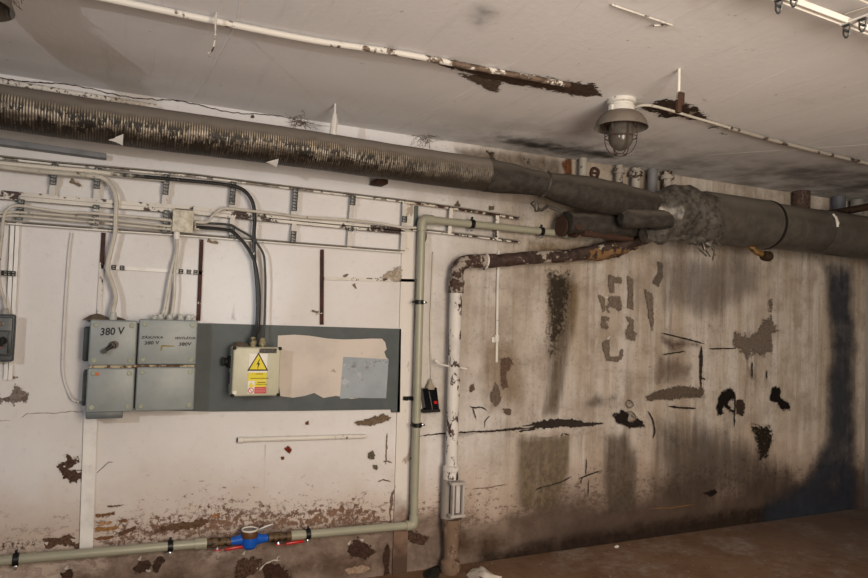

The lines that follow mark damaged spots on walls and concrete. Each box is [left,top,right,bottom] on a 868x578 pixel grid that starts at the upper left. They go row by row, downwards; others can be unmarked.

peeling [644,261,663,332]
peeling [598,274,637,362]
flaking render [0,376,29,406]
peeling [354,413,391,426]
leakage [458,268,856,562]
flaking render [56,454,82,484]
crack [354,406,603,525]
flaking render [43,534,80,550]
flaking render [133,556,166,574]
flaking render [234,551,292,578]
flaking render [347,536,390,575]